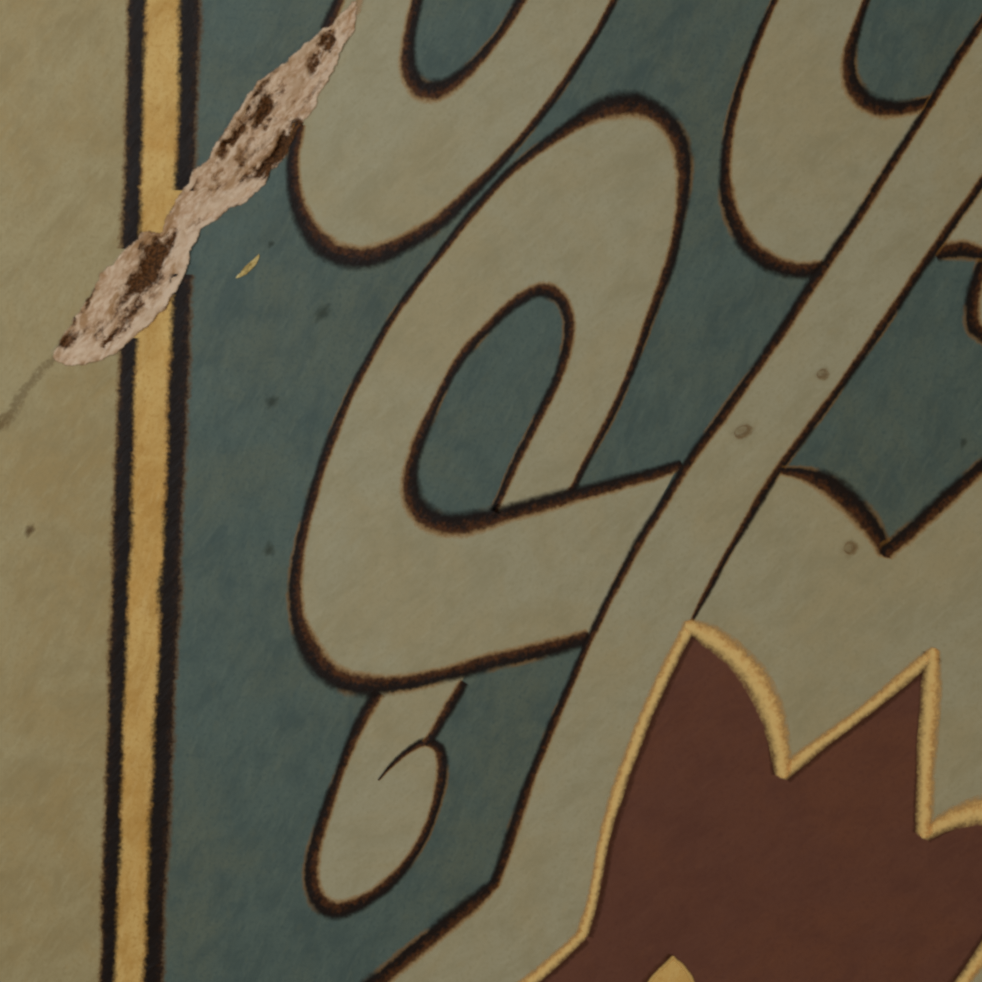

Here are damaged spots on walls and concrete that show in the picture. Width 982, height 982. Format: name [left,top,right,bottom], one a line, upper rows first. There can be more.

peeling [236,254,259,278]